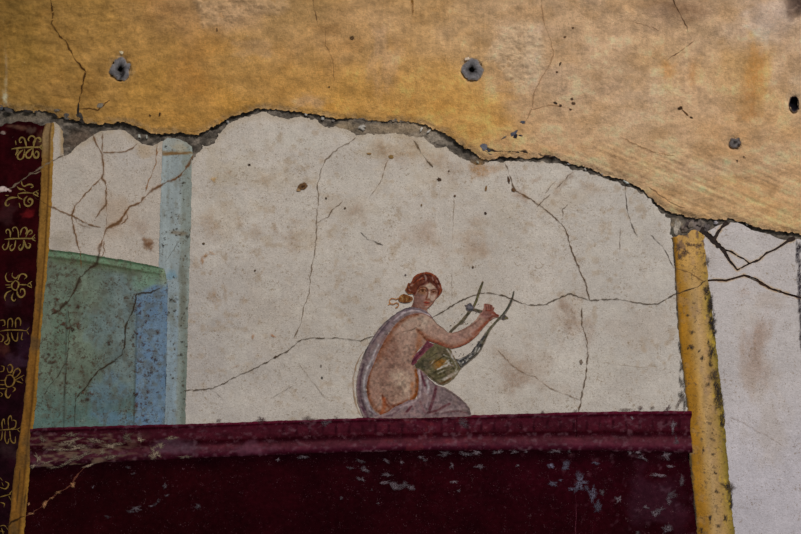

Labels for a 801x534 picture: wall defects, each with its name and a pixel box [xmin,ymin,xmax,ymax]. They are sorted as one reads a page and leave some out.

crack [50,0,108,111]
crack [3,155,64,192]
crack [45,288,160,426]
crack [34,135,193,322]
crack [184,137,373,391]
spalling [0,104,801,347]
crack [403,147,801,437]
peeling [678,286,725,427]
peeling [31,433,142,469]
peeling [570,474,604,510]